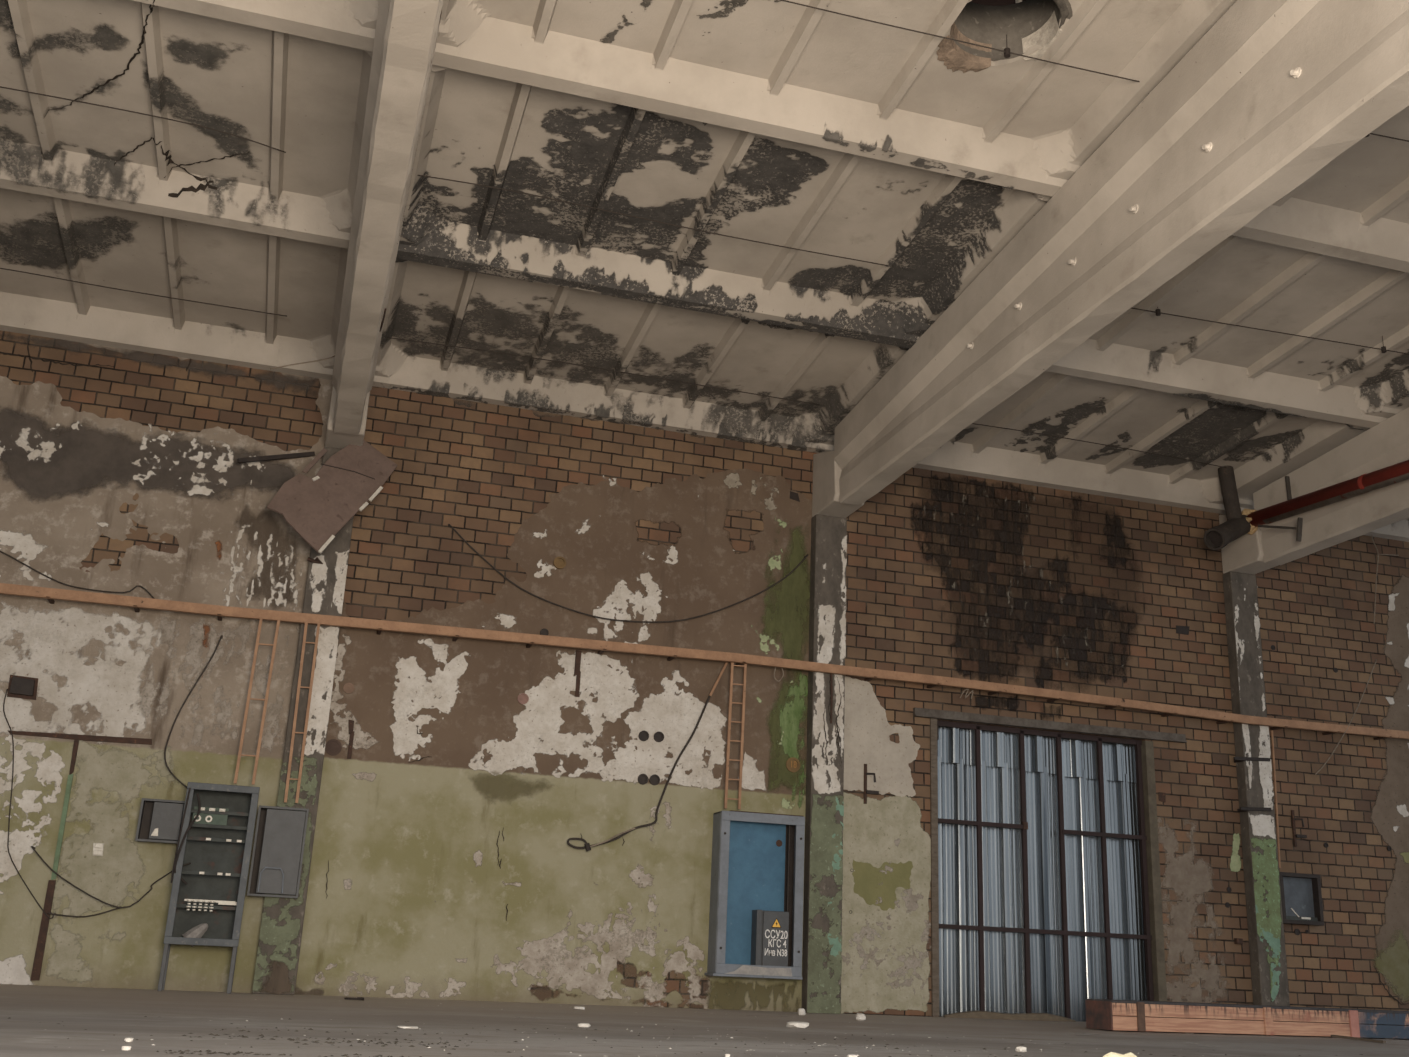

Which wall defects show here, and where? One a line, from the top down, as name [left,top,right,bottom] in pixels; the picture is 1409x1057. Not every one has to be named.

damp [0,0,128,67]
damp [0,99,137,204]
crack [43,0,155,119]
crack [114,137,250,198]
damp [144,64,256,167]
spalling [699,0,748,36]
damp [375,103,1014,453]
flaking render [0,330,324,572]
damp [1086,393,1305,470]
flaking render [0,387,817,1009]
flaking render [807,535,931,1014]
flaking render [1157,586,1282,1003]